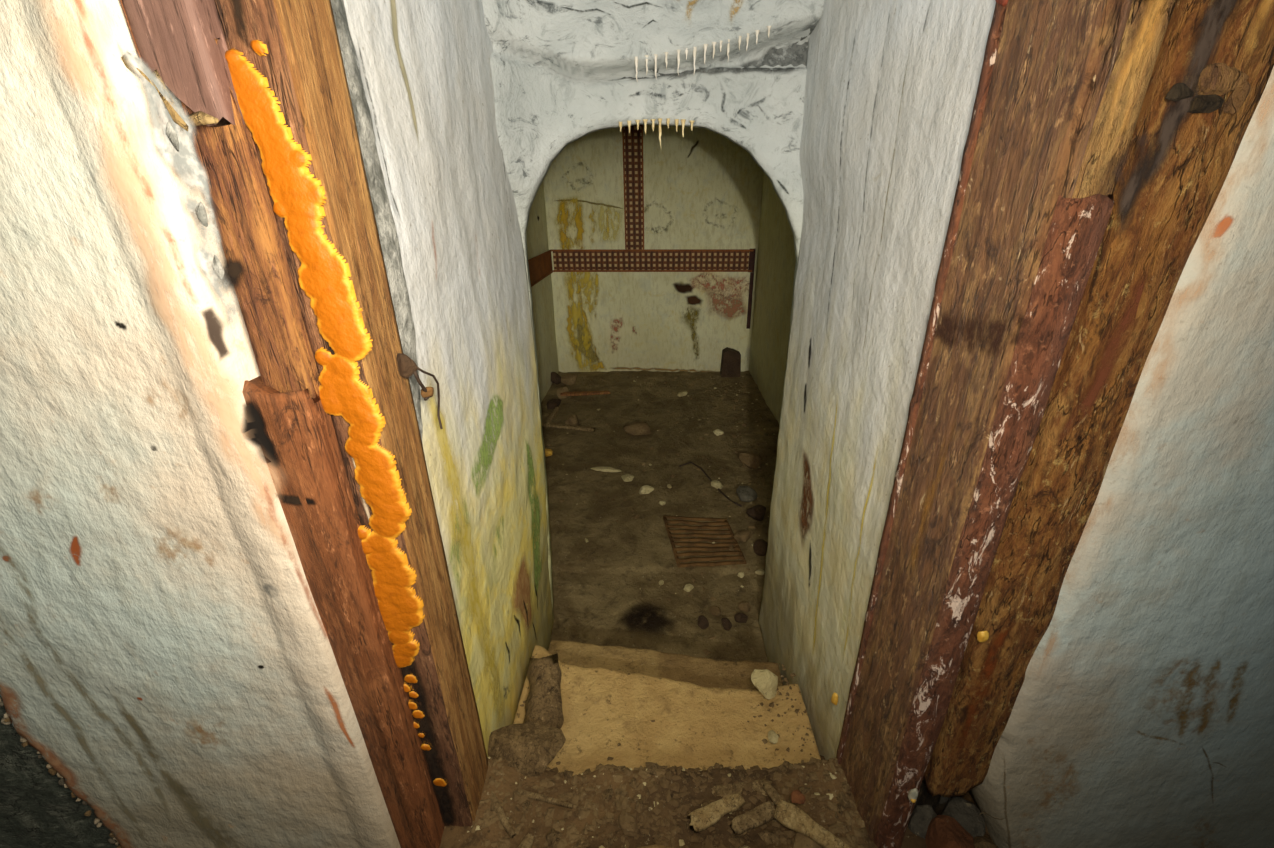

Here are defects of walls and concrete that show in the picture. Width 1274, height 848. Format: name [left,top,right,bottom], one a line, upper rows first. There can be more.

damp [621,24,817,80]
damp [557,162,620,250]
damp [567,272,708,372]
rust [1138,662,1220,740]